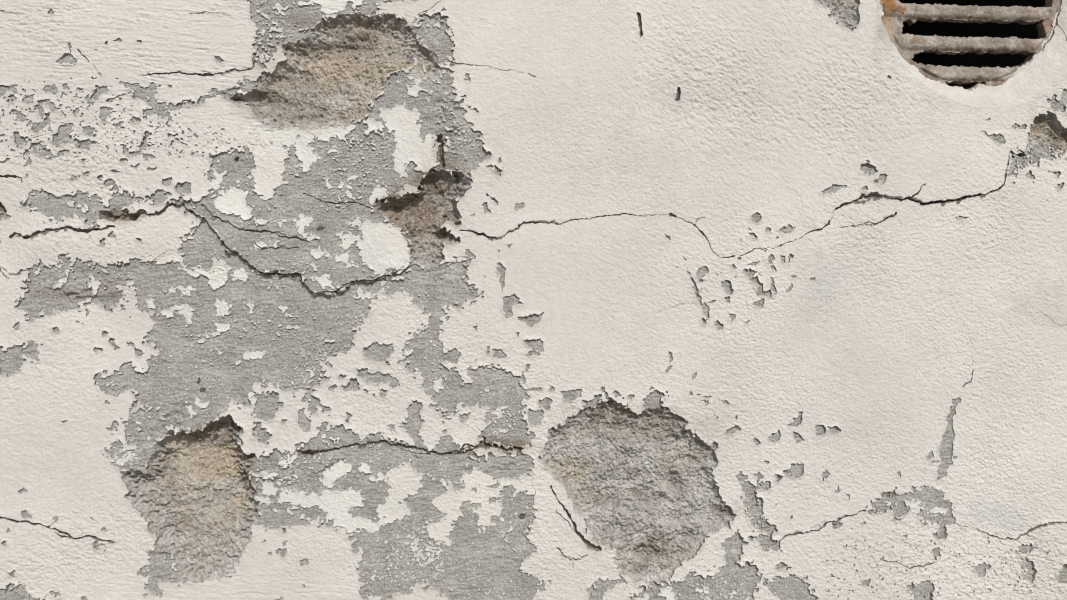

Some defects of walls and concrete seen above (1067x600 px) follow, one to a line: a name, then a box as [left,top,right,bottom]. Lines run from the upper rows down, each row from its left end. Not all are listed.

flaking render [815,0,859,31]
flaking render [982,89,1067,187]
peeling [822,184,846,194]
crack [459,184,1002,258]
peeling [0,0,817,600]
peeling [815,425,840,435]
peeling [832,397,961,600]
crack [2,517,115,543]
crack [550,485,601,558]
crack [775,510,865,542]
crack [964,521,1067,540]